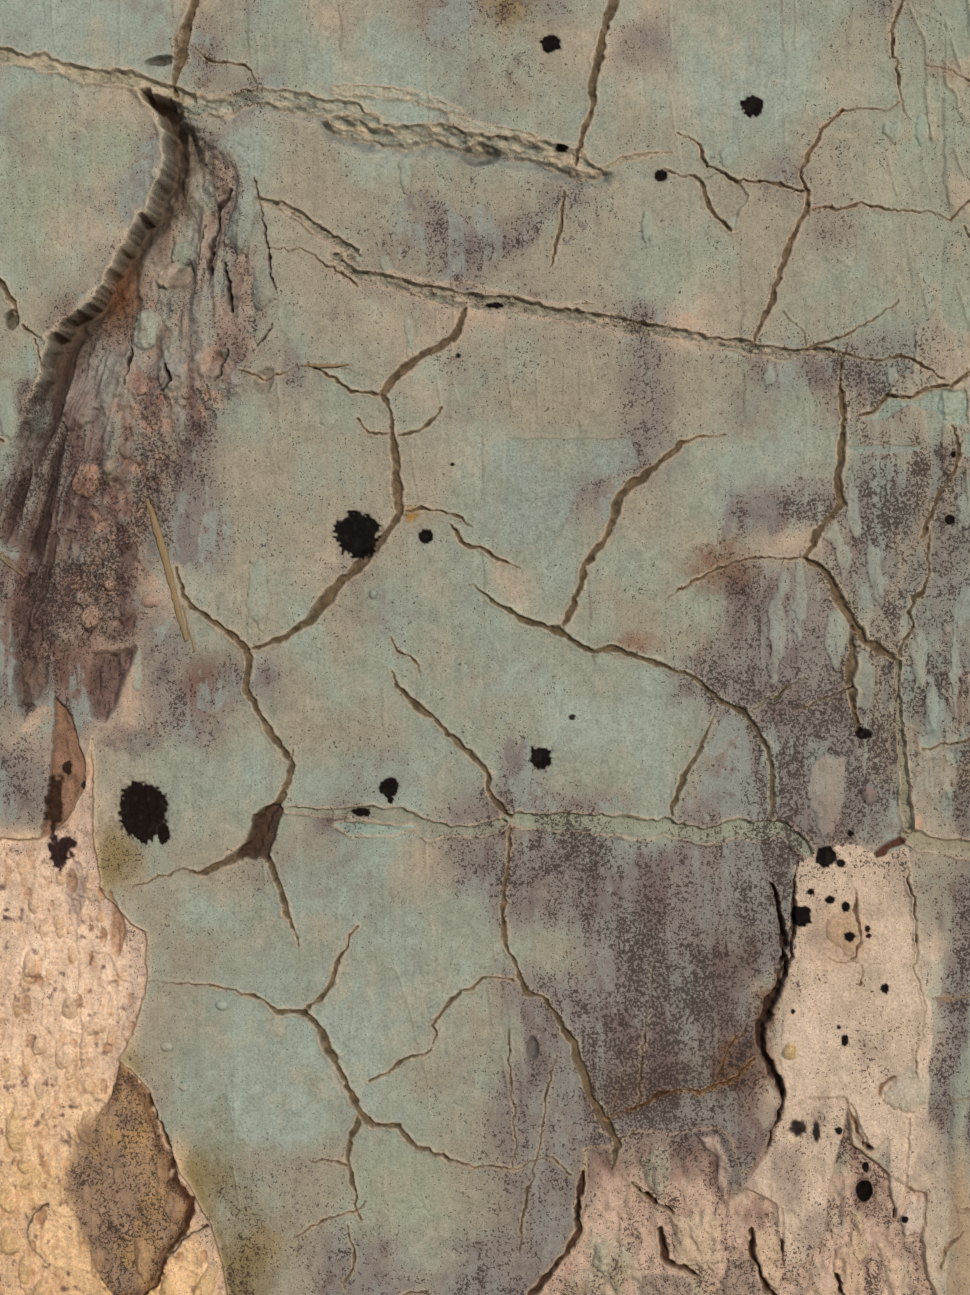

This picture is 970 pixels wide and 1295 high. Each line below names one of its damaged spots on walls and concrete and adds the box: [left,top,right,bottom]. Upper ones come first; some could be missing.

spalling [142,55,174,68]
crack [0,0,671,182]
crack [0,278,51,371]
spalling [0,88,281,724]
crack [175,0,970,1171]
crack [134,846,300,946]
spalling [236,804,283,862]
flaking render [0,738,229,1295]
crack [152,926,573,1291]
crack [631,1181,675,1216]
flaking render [526,837,937,1295]
crack [939,1208,970,1270]